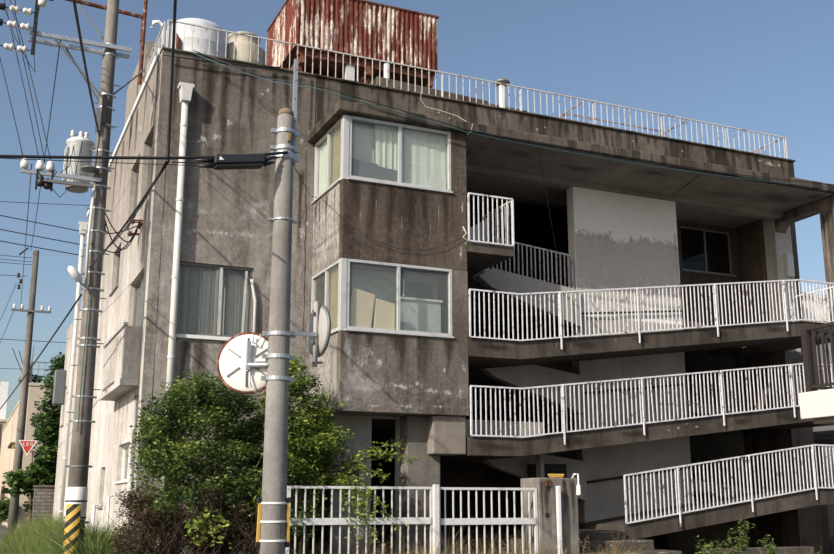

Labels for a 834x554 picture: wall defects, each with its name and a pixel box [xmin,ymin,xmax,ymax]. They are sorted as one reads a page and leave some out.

water stain [207,63,229,104]
water stain [273,73,313,108]
water stain [575,230,681,316]
water stain [393,336,405,358]